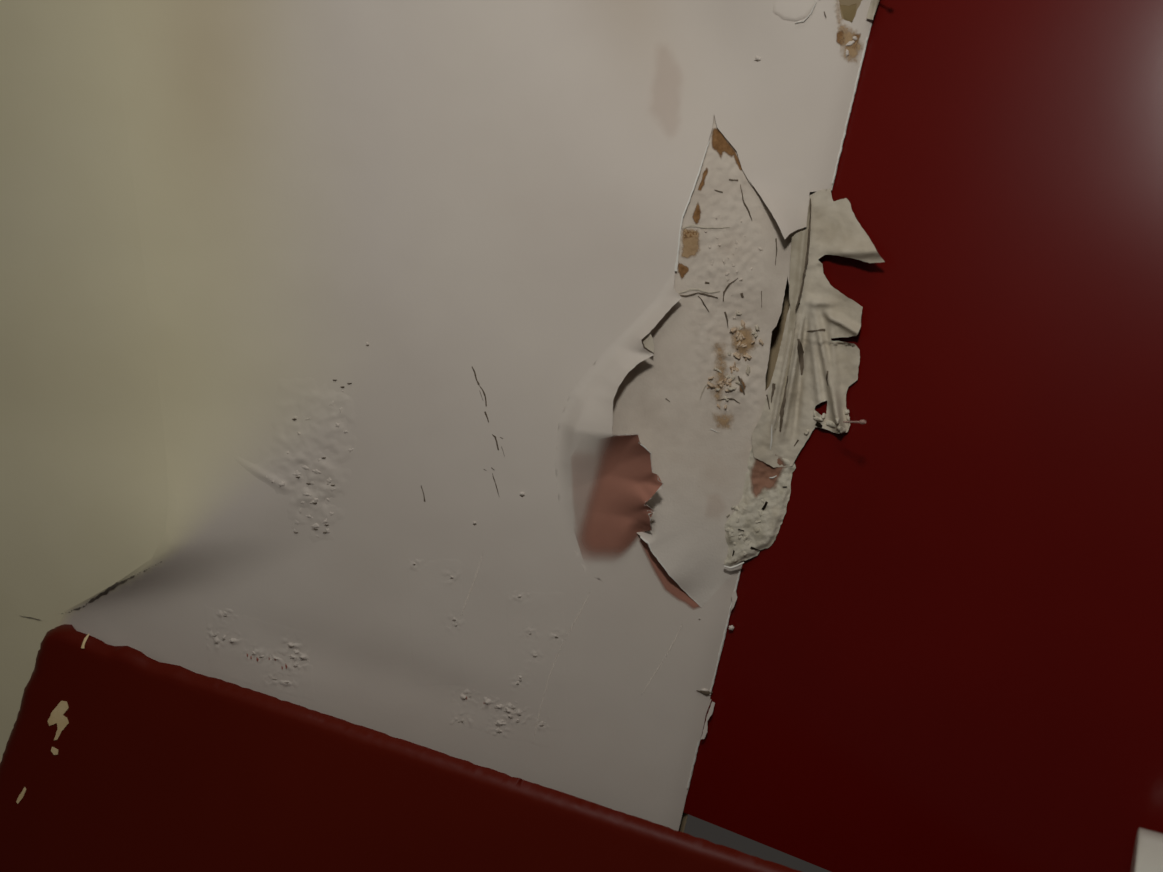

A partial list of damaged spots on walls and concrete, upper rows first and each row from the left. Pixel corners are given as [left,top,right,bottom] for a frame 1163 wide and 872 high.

spalling [837,0,879,60]
peeling [554,116,810,620]
peeling [48,701,69,755]
spalling [701,702,715,739]